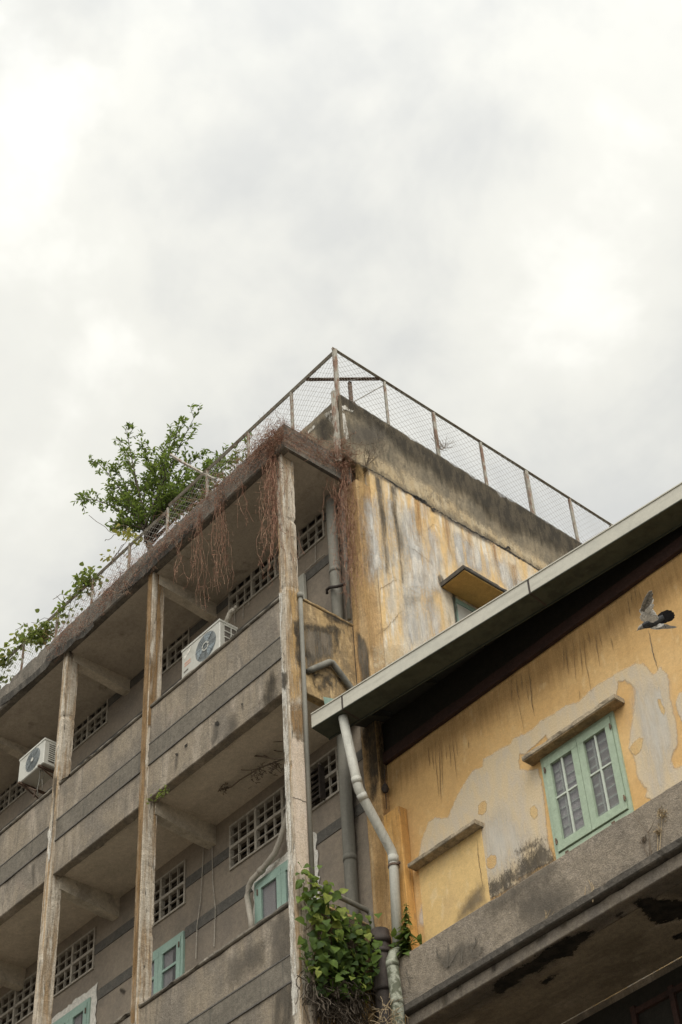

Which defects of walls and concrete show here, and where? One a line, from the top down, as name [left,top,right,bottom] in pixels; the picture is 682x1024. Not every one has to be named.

damp [341,395,582,578]
damp [263,590,348,737]
damp [357,633,403,681]
peeling [419,663,682,899]
damp [462,838,563,916]